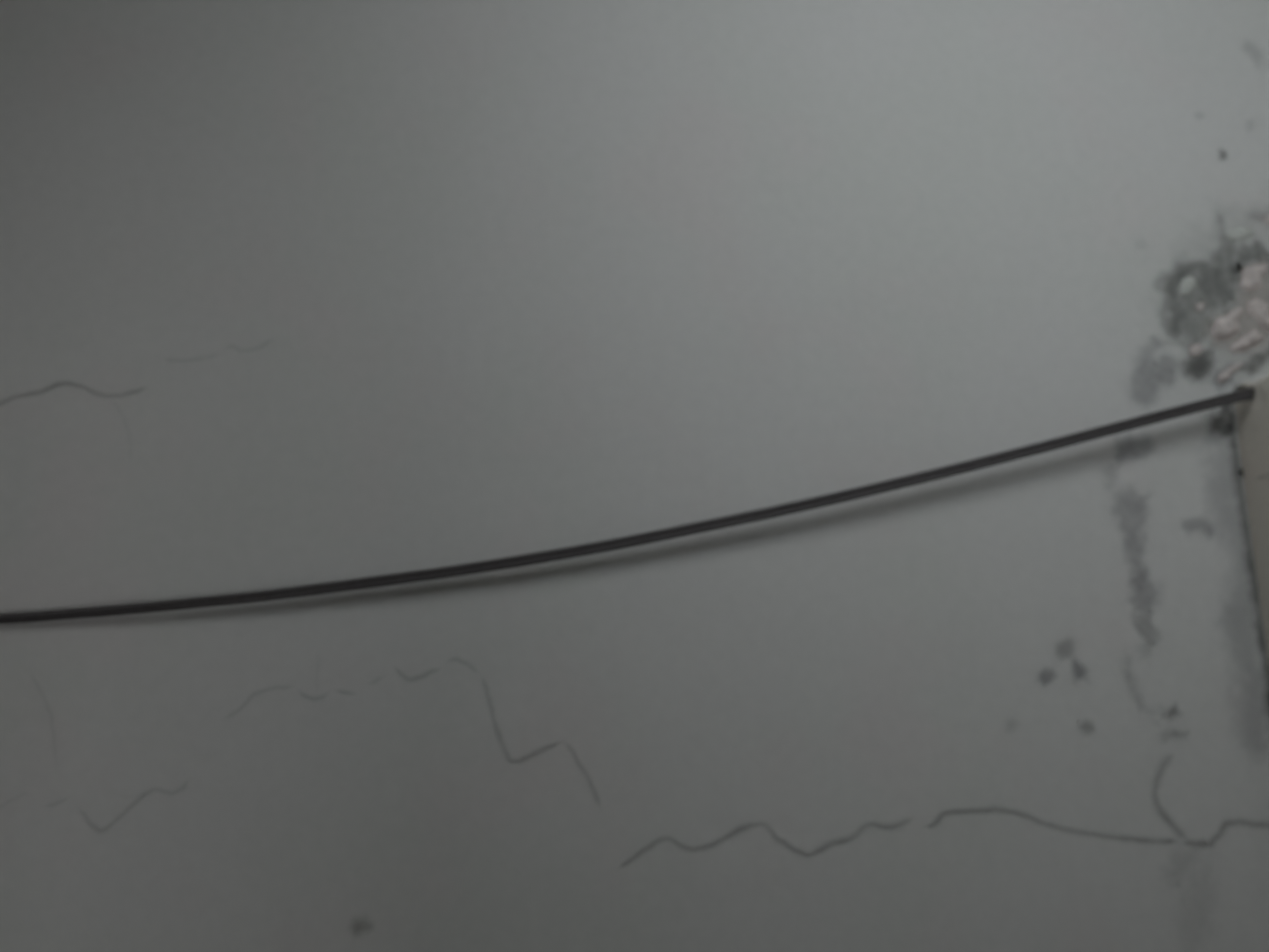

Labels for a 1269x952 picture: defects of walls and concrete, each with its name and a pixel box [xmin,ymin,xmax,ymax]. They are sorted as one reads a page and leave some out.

flaking render [1177,275,1205,313]
flaking render [1188,263,1269,395]